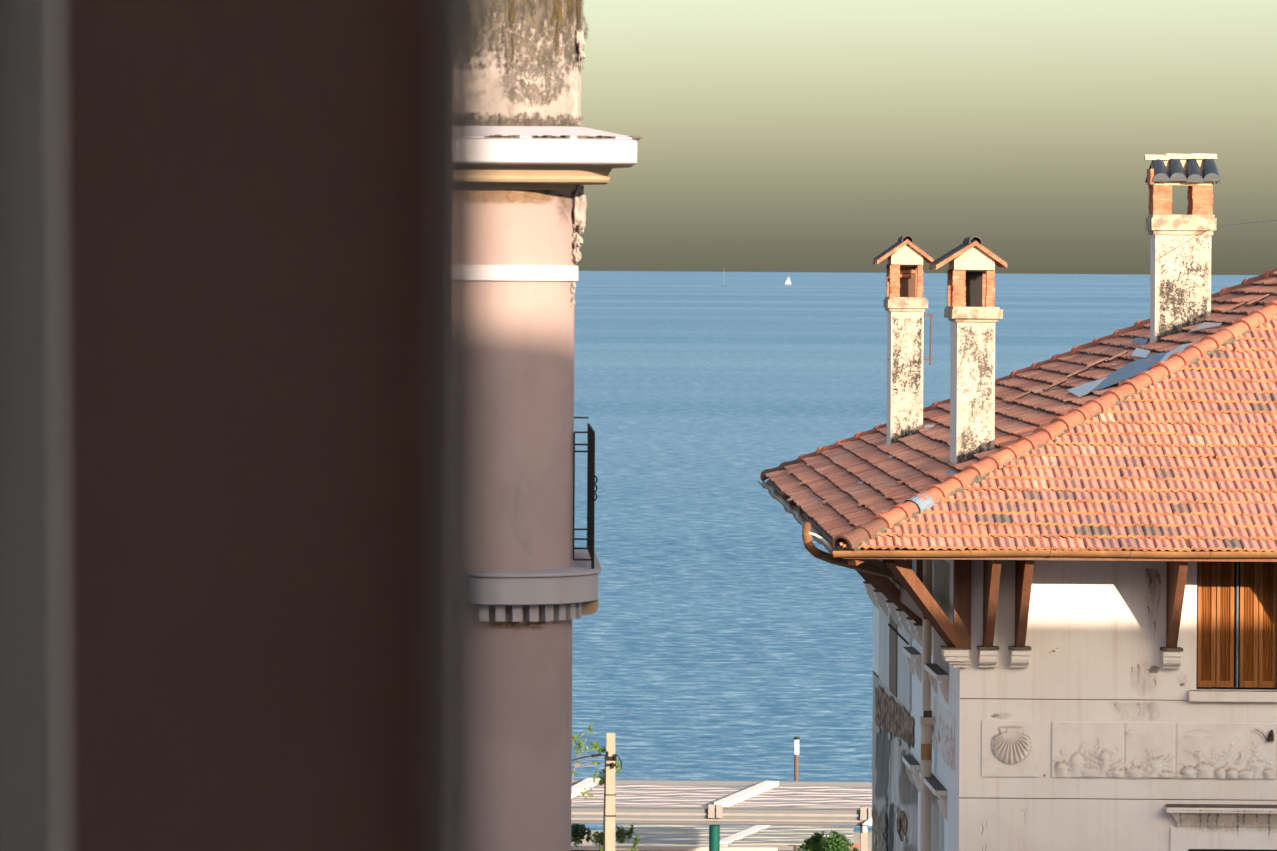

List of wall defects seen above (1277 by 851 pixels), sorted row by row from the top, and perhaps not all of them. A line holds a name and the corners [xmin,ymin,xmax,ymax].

leakage [483,0,588,127]
leakage [1156,236,1209,343]
leakage [891,315,922,444]
leakage [957,326,994,464]
flaking render [875,685,914,749]